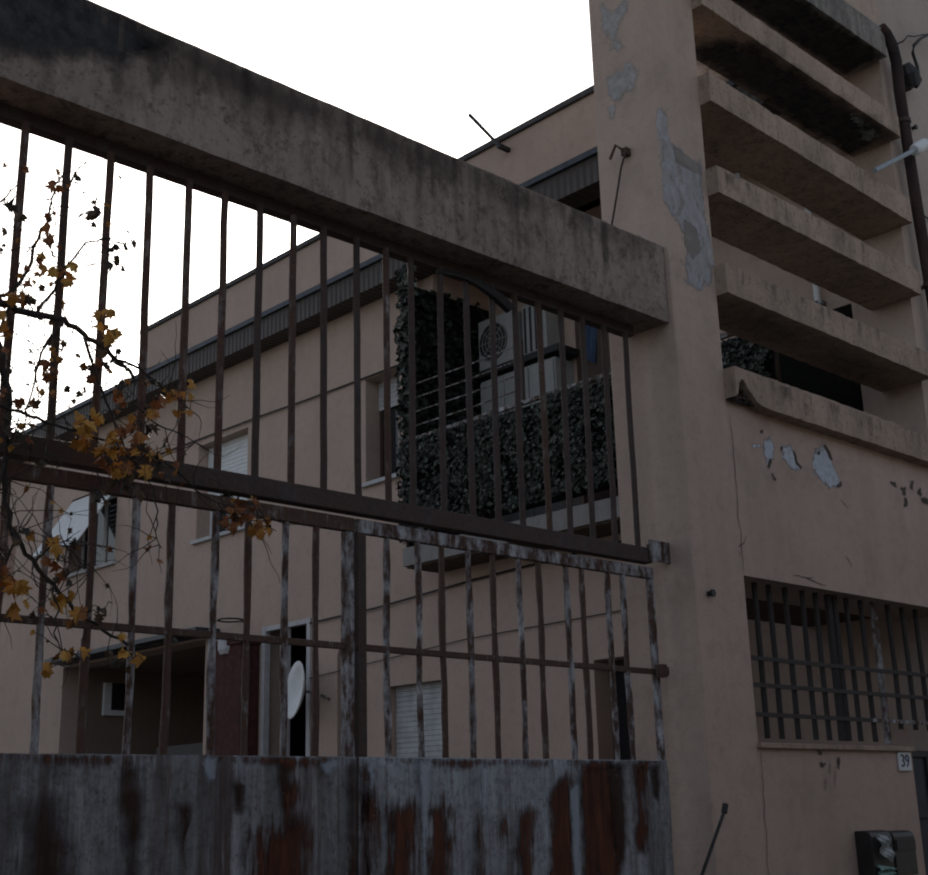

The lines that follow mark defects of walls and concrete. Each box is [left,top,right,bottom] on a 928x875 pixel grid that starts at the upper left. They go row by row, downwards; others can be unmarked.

water stain [0,0,170,63]
peeling [656,109,714,290]
peeling [752,430,842,488]
rust [10,754,141,875]
rust [209,756,456,875]
rust [386,758,552,769]
rust [501,807,538,875]
rust [549,760,664,875]